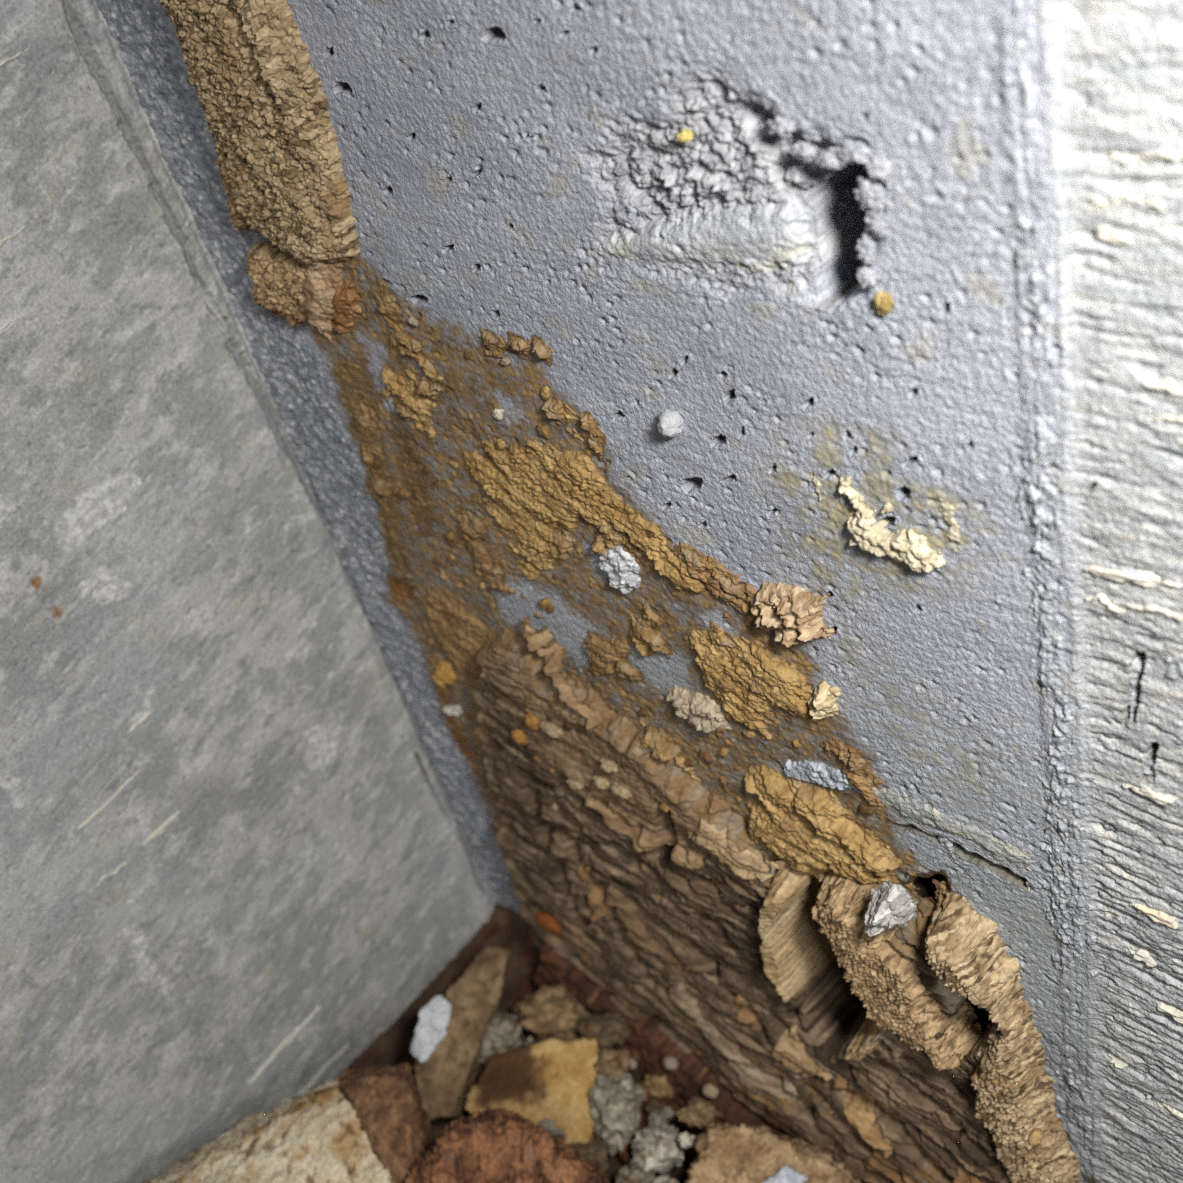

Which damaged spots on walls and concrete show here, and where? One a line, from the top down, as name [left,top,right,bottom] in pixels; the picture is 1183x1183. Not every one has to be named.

peeling [478,327,553,366]
peeling [395,374,450,419]
spalling [492,409,504,420]
peeling [542,395,607,461]
spalling [591,522,673,658]
peeling [672,545,745,605]
peeling [585,629,644,683]
spalling [441,704,464,717]
peeling [640,725,684,762]
spalling [783,738,870,790]
crack [729,729,1034,895]
spalling [864,869,953,937]